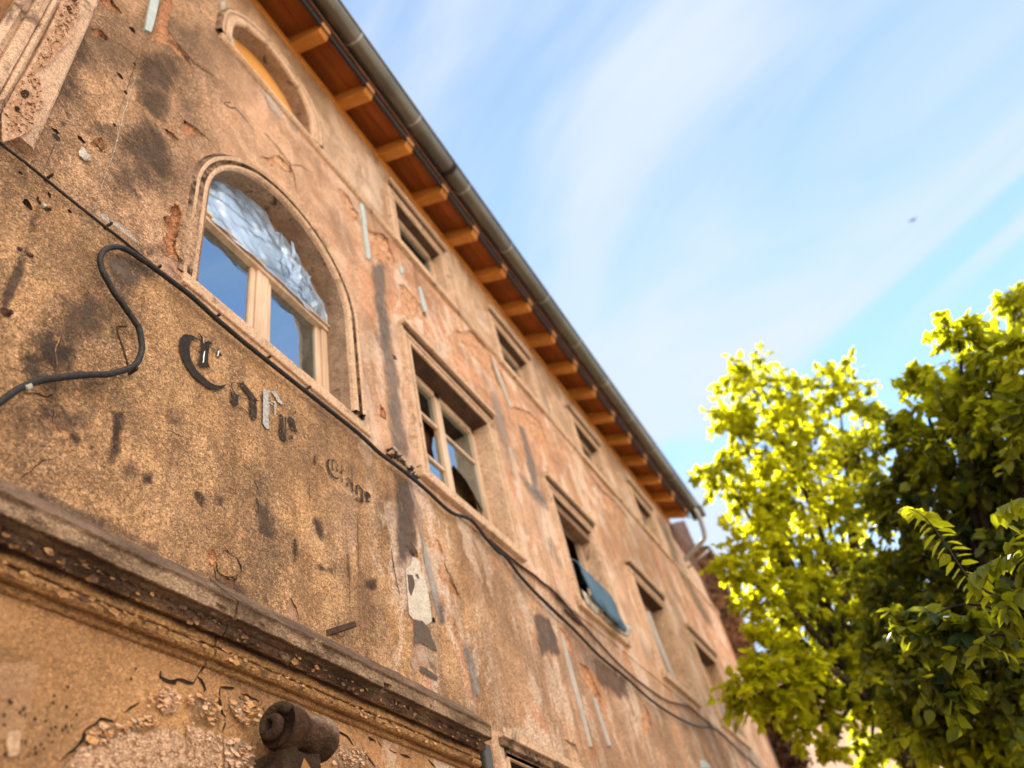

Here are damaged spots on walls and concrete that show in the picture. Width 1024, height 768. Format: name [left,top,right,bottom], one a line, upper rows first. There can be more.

peeling [1,0,81,142]
spalling [77,135,106,153]
spalling [154,203,201,287]
crack [213,546,245,587]
damp [396,475,456,625]
peeling [0,525,482,768]
damp [535,614,560,655]
crack [159,666,266,732]